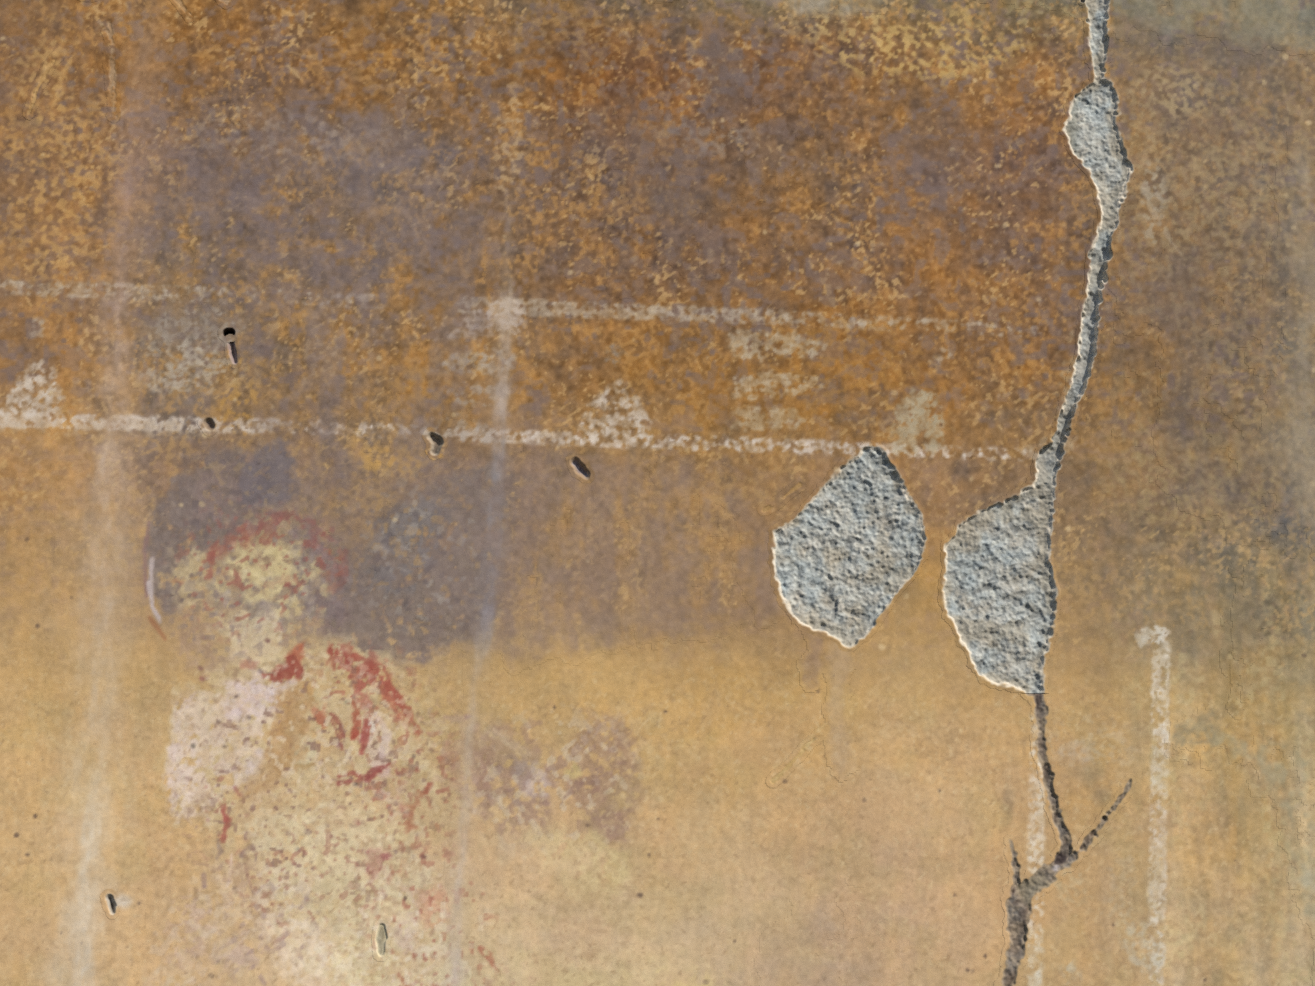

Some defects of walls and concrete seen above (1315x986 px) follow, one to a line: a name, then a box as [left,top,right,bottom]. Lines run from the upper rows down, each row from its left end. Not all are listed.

crack [1077,0,1115,80]
flaking render [1059,78,1136,193]
crack [1026,191,1131,483]
flaking render [768,439,1061,693]
crack [994,693,1138,986]